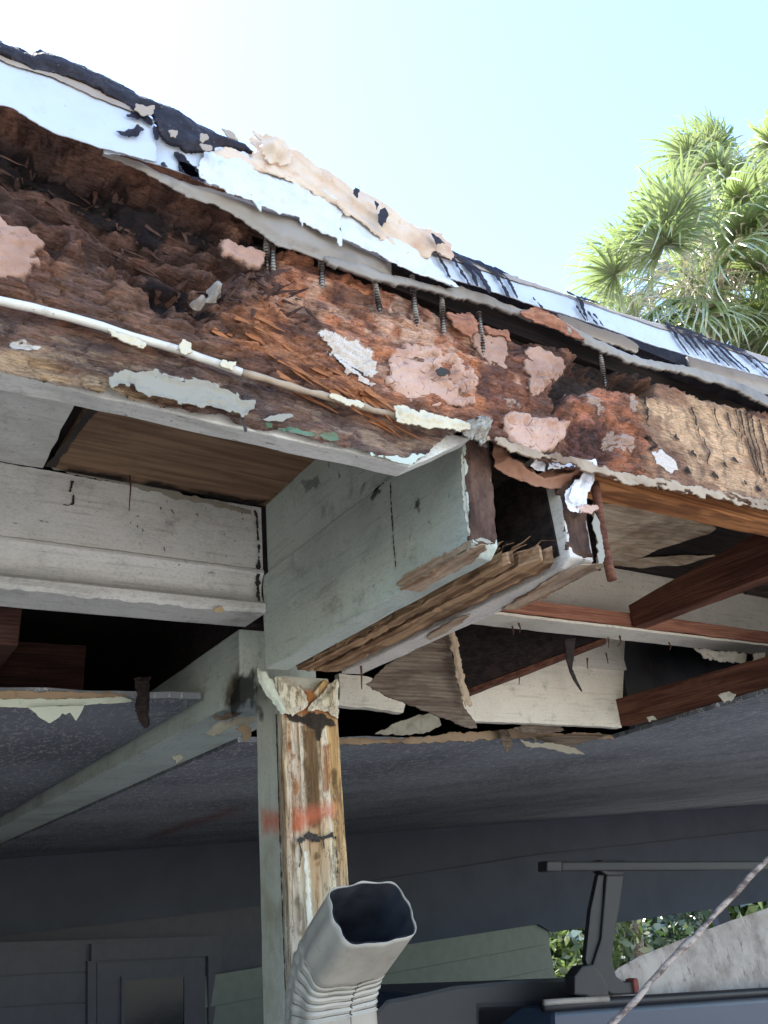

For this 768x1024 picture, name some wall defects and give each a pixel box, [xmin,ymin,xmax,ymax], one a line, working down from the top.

peeling [134,103,155,117]
peeling [197,128,459,288]
spalling [0,151,219,321]
peeling [109,368,256,418]
peeling [262,414,293,422]
peeling [370,452,426,465]
spalling [339,728,614,746]